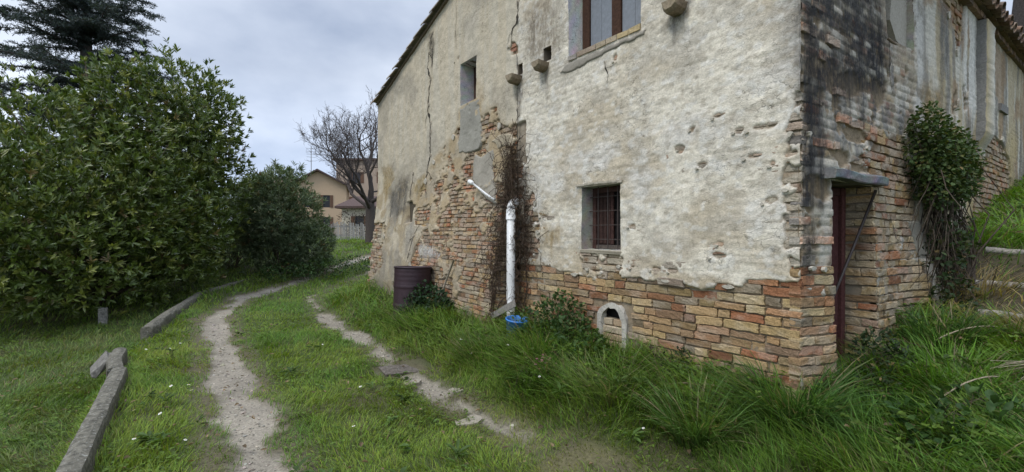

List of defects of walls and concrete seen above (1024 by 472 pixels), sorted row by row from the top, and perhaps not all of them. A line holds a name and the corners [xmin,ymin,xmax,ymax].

crack [410,31,456,193]
crack [508,0,520,56]
leakage [803,0,887,206]
spalling [367,220,386,281]
spalling [408,74,846,409]